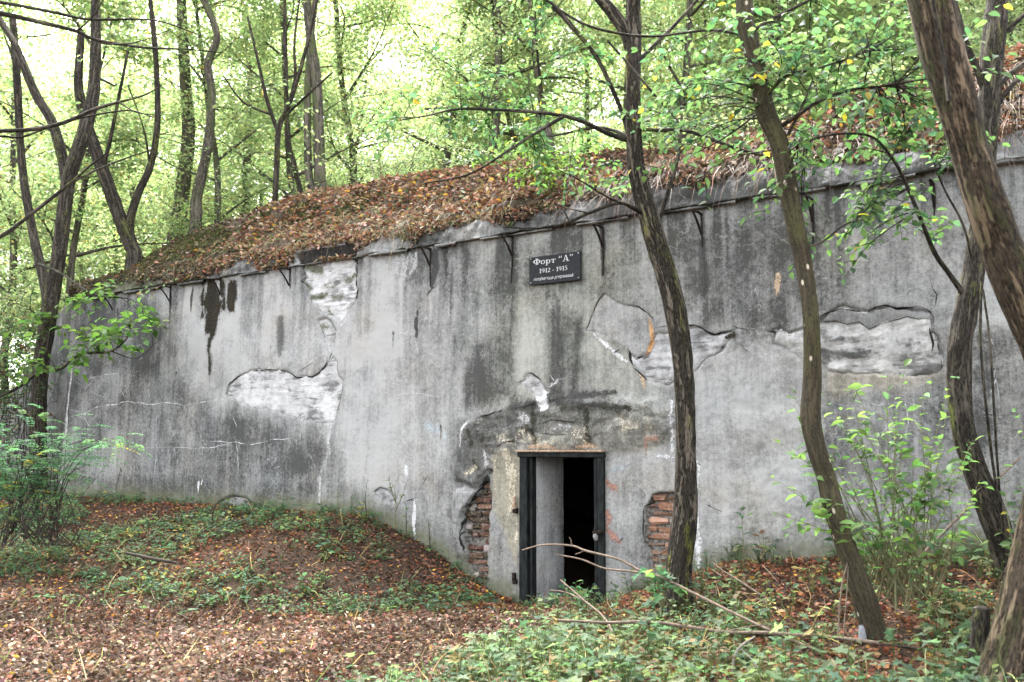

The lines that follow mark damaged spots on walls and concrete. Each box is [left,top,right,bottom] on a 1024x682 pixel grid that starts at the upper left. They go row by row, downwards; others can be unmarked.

spalling [298,244,359,323]
leakage [190,279,238,376]
peeling [585,295,674,388]
spalling [689,324,736,371]
spalling [766,329,803,358]
spalling [819,305,944,376]
leakage [65,366,73,436]
spalling [227,357,343,424]
peeling [520,373,558,411]
flaking render [459,471,492,583]
flaking render [642,492,674,572]